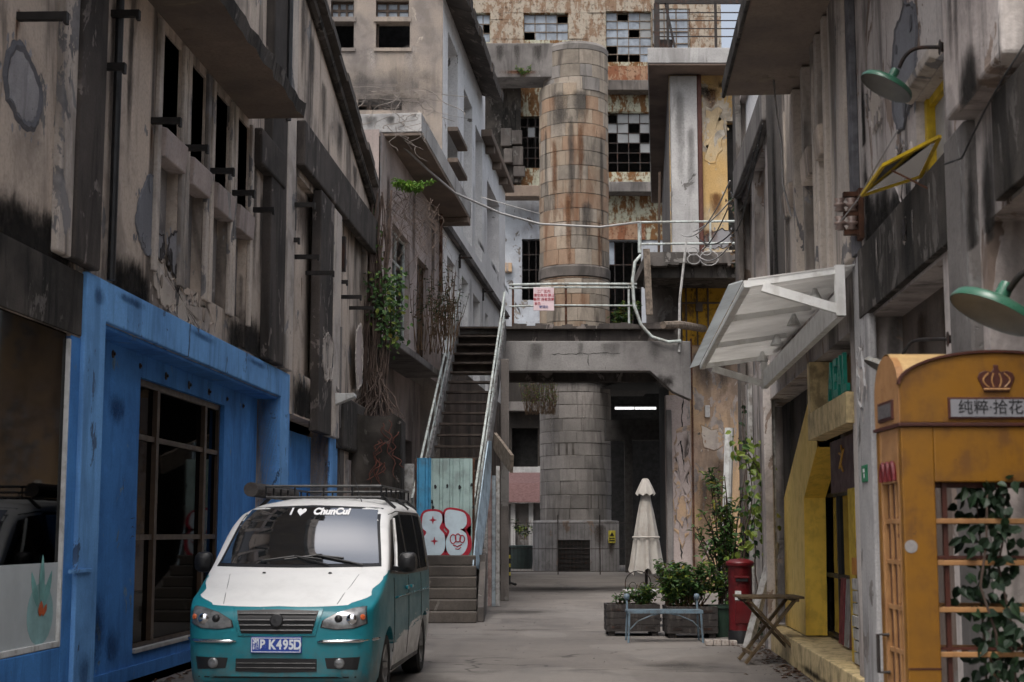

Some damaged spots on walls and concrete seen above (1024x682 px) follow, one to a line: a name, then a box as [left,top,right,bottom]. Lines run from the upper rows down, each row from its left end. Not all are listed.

flaking render [891,0,920,83]
flaking render [0,32,48,145]
flaking render [703,102,729,170]
leakage [0,195,68,266]
flaking render [133,172,219,333]
crack [678,400,688,485]
flaking render [672,413,725,562]